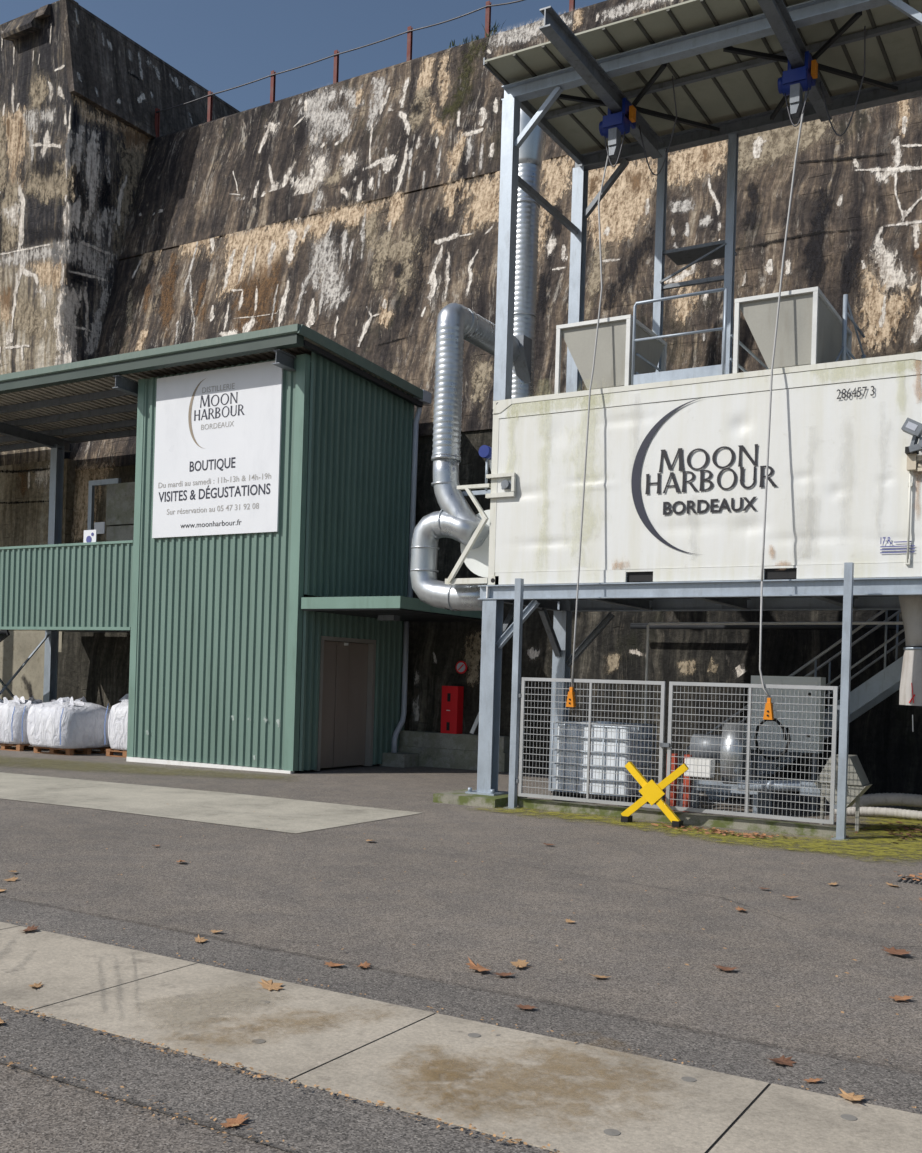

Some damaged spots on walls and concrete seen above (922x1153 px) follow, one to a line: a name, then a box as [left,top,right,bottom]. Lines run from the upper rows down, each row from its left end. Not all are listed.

leakage [128,51,195,95]
leakage [238,77,498,200]
leakage [0,85,145,365]
leakage [184,242,198,340]
leakage [209,286,258,336]
leakage [270,201,371,337]
leakage [401,206,458,335]